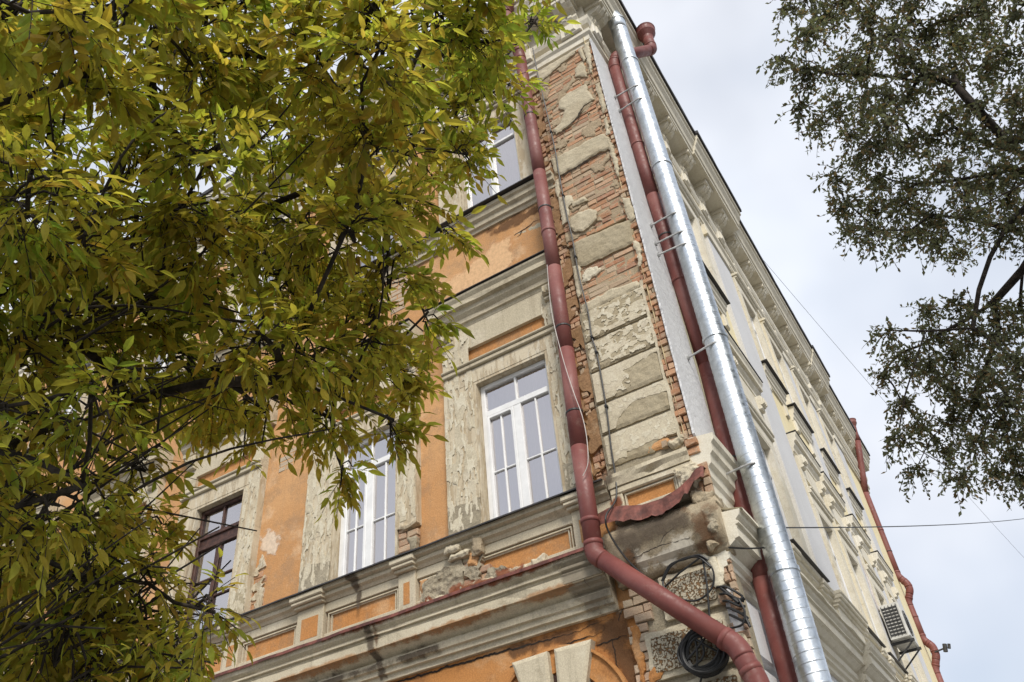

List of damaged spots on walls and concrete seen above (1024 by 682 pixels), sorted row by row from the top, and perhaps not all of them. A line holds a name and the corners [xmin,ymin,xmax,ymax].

flaking render [531,42,757,658]
peeling [227,466,267,619]
peeling [279,439,338,592]
peeling [397,440,420,554]
peeling [419,333,548,603]
crack [631,531,691,560]
damp [363,625,387,680]
flaking render [623,589,665,682]